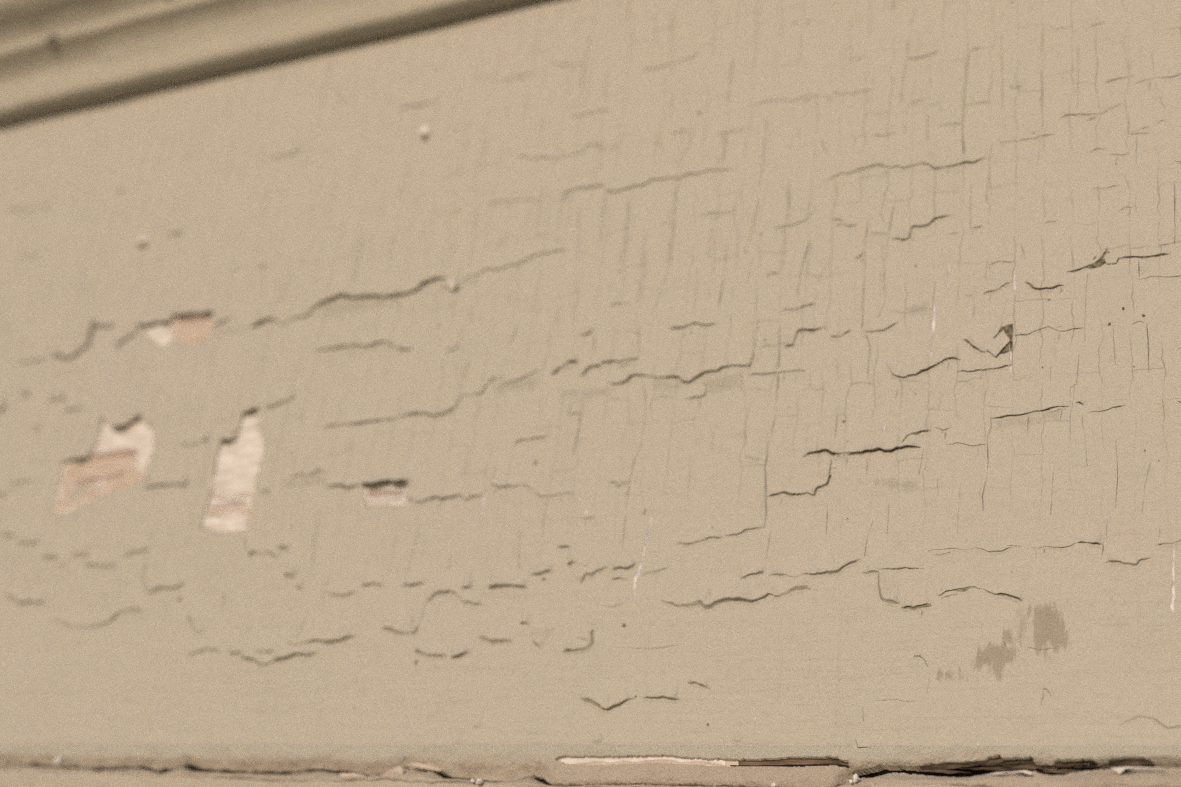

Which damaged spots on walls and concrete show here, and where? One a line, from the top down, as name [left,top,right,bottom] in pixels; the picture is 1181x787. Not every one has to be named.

crack [19,309,139,366]
peeling [135,301,222,348]
crack [188,28,1181,714]
peeling [53,403,160,517]
crack [142,423,211,496]
peeling [198,396,269,536]
peeling [361,469,415,510]
crack [84,529,184,597]
crack [1118,709,1181,732]
crack [0,764,367,776]
crack [406,767,497,783]
crack [535,777,563,787]